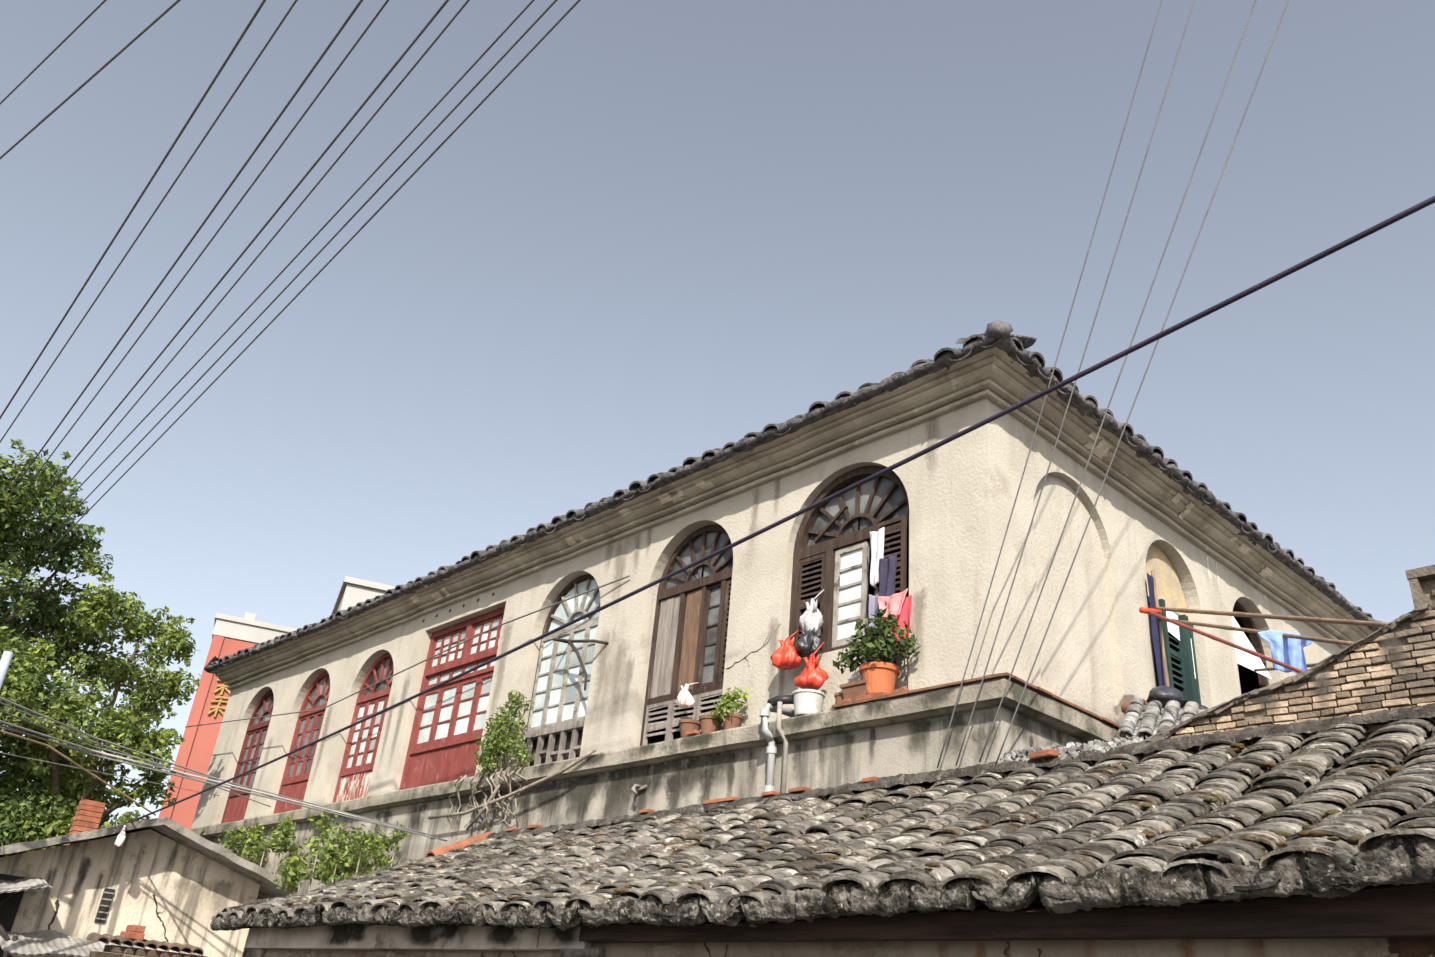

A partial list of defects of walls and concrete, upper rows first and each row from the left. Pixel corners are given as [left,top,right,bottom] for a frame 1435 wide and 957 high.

leakage [449,733,755,827]
leakage [73,858,103,898]
crack [1003,941,1042,957]
flaking render [1382,938,1435,957]